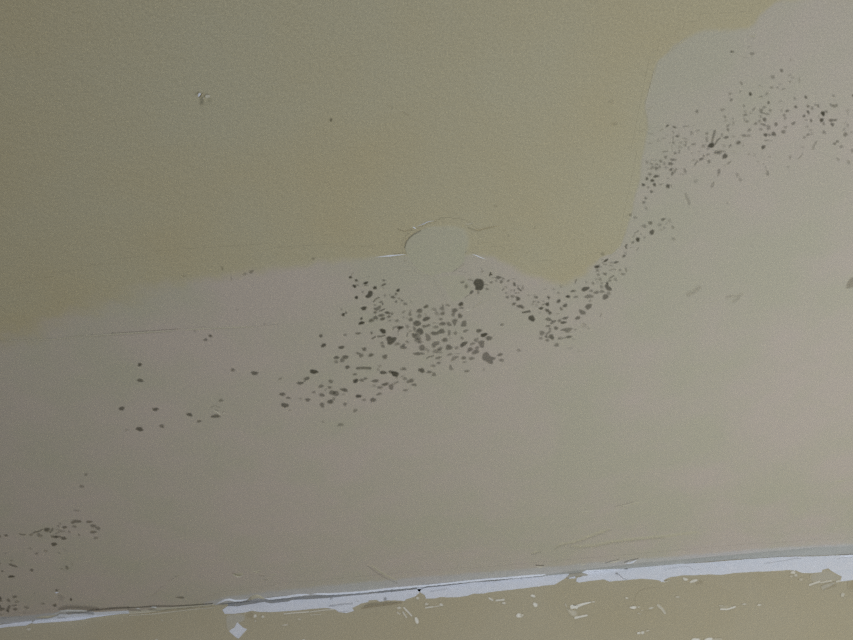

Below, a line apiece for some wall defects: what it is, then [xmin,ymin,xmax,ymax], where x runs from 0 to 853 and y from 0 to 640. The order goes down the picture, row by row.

peeling [223,555,853,638]